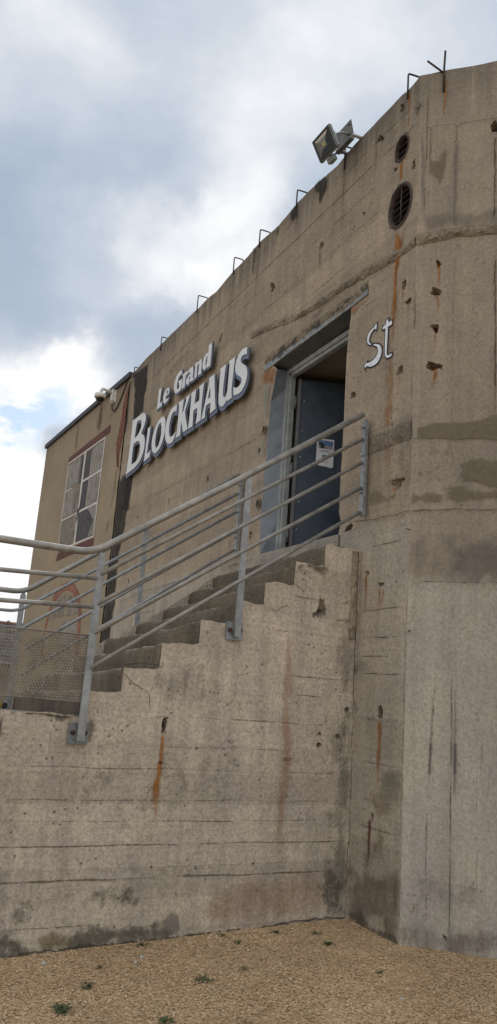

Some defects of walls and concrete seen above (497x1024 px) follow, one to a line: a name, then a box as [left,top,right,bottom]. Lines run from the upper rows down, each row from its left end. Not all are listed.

corrosion [393,235,403,316]
spalling [390,477,405,490]
corrosion [153,738,164,800]